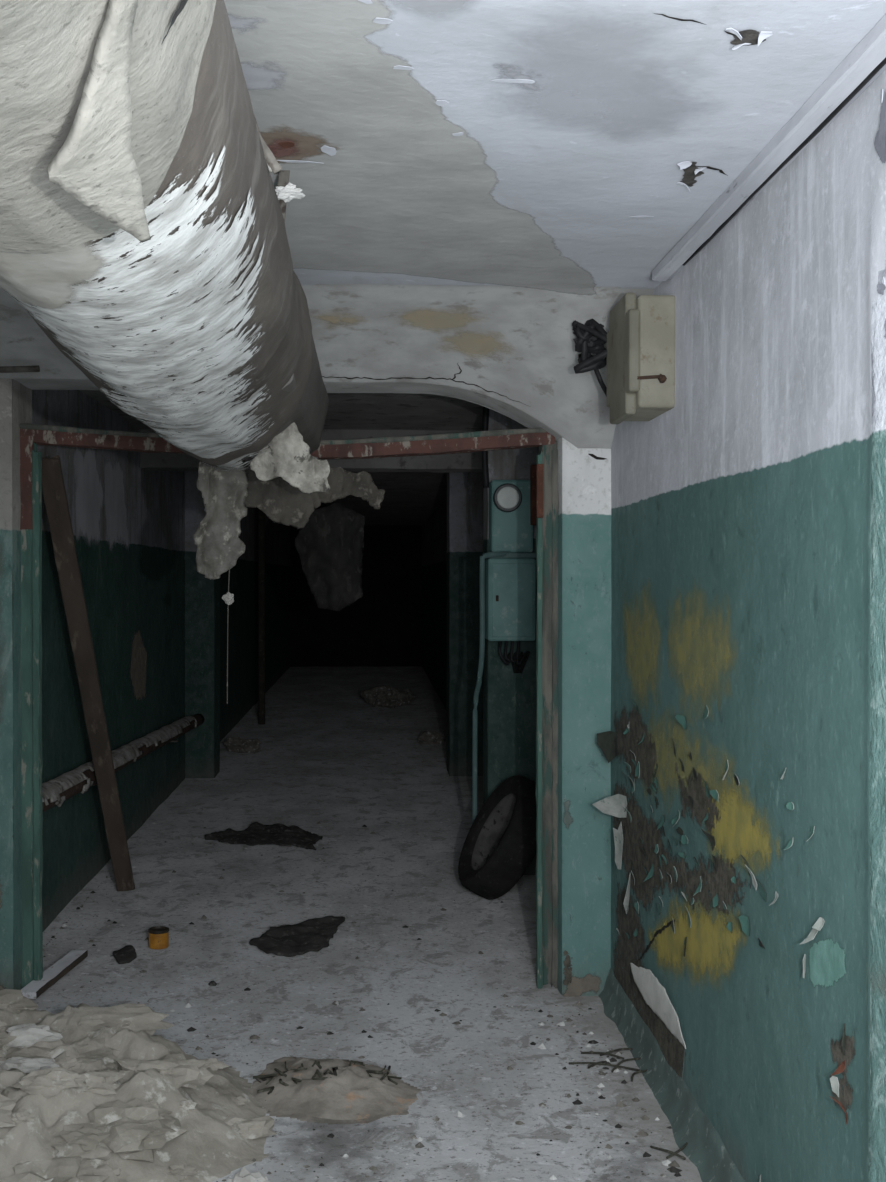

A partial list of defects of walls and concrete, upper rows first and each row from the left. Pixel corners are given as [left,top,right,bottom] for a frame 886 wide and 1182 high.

spalling [725,28,773,50]
rust [260,128,337,165]
peeling [224,0,596,295]
spalling [677,161,728,191]
peeling [874,89,886,163]
peeling [592,699,778,1081]
peeling [799,917,846,988]
spalling [830,1023,855,1124]